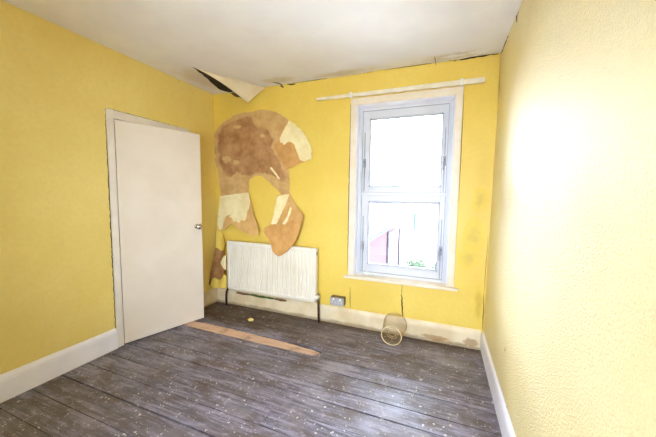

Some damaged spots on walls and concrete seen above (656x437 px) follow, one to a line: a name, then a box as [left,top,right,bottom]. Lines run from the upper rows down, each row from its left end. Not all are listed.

peeling [273,121,312,170]
peeling [209,193,303,288]